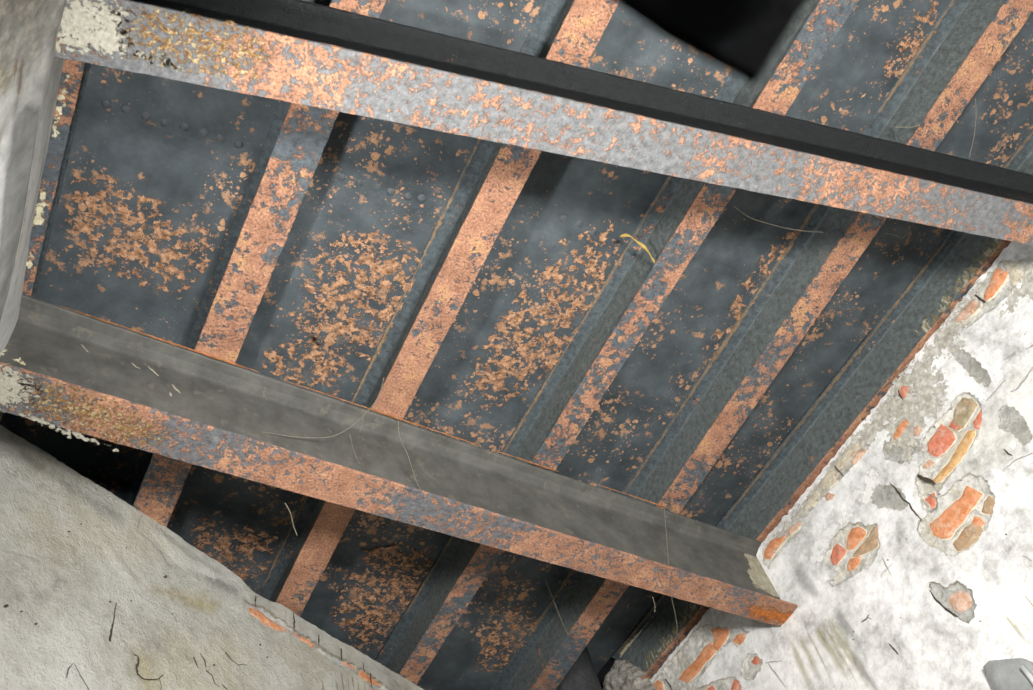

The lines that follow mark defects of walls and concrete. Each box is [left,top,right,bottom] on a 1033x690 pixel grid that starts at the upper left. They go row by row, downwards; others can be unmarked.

corrosion [110,6,274,79]
corrosion [58,139,481,444]
corrosion [464,176,672,472]
corrosion [21,378,169,450]
spalling [762,259,1033,569]
corrosion [186,496,309,587]
corrosion [329,536,453,642]
corrosion [475,569,574,672]
spalling [603,624,763,690]
corrosion [749,603,794,624]
spalling [810,513,888,587]
spalling [929,580,981,624]